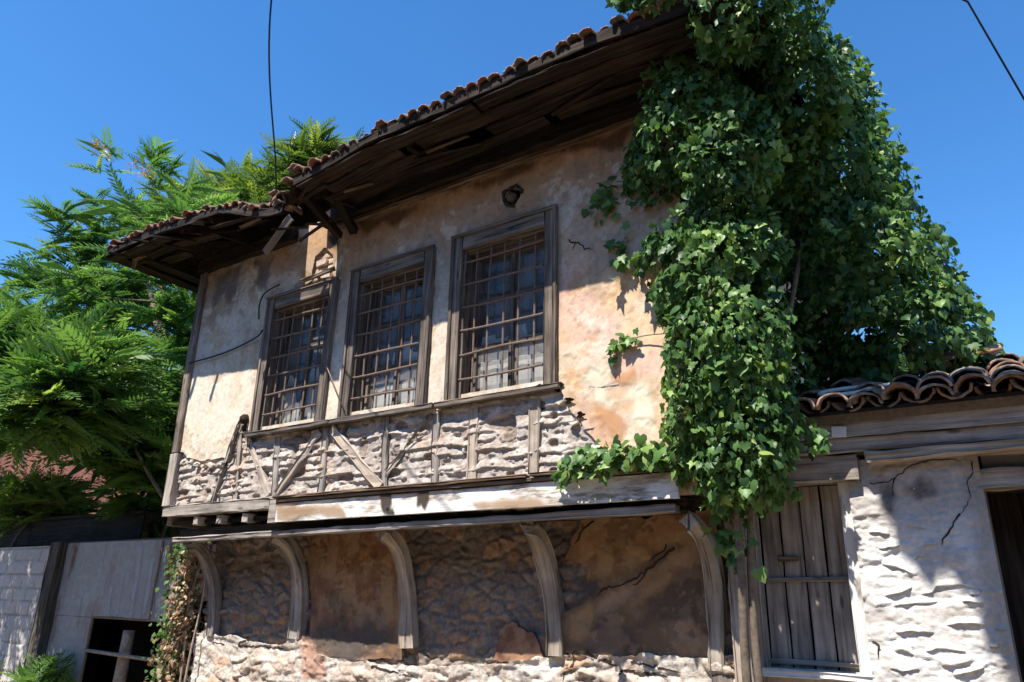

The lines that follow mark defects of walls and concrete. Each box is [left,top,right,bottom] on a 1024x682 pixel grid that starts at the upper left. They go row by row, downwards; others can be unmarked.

flaking render [175,360,655,505]
crack [870,459,973,545]
crack [592,544,675,601]
flaking render [494,621,545,662]